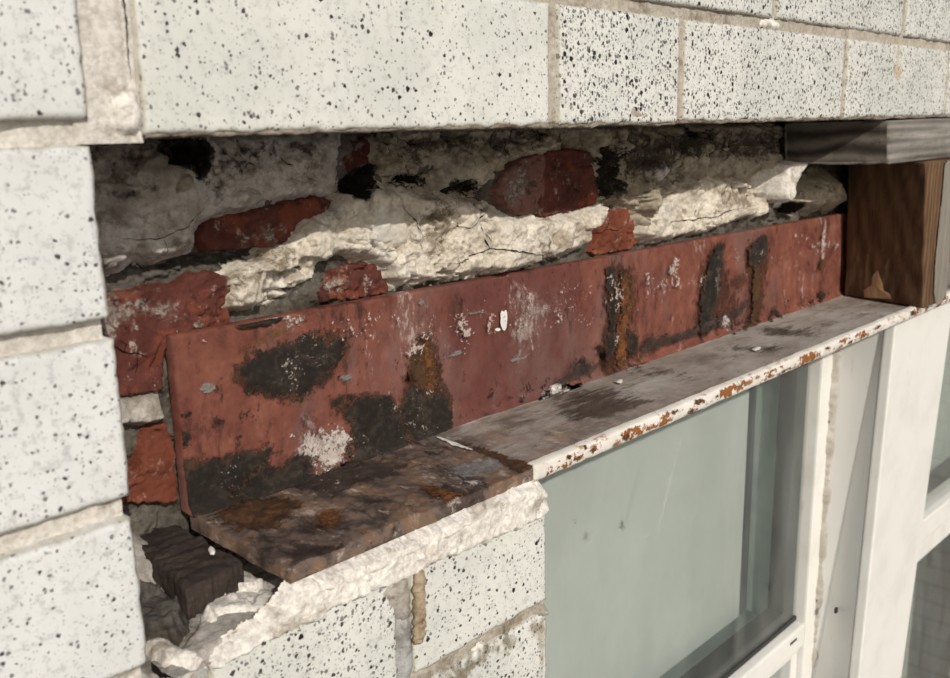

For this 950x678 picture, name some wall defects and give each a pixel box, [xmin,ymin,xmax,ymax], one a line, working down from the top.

spalling [363,108,785,226]
spalling [80,133,341,277]
peeling [235,315,302,330]
corrosion [555,261,700,385]
corrosion [546,324,882,476]
corrosion [207,496,302,532]
corrosion [289,508,352,565]
corrosion [420,483,474,502]
peeling [450,457,506,484]